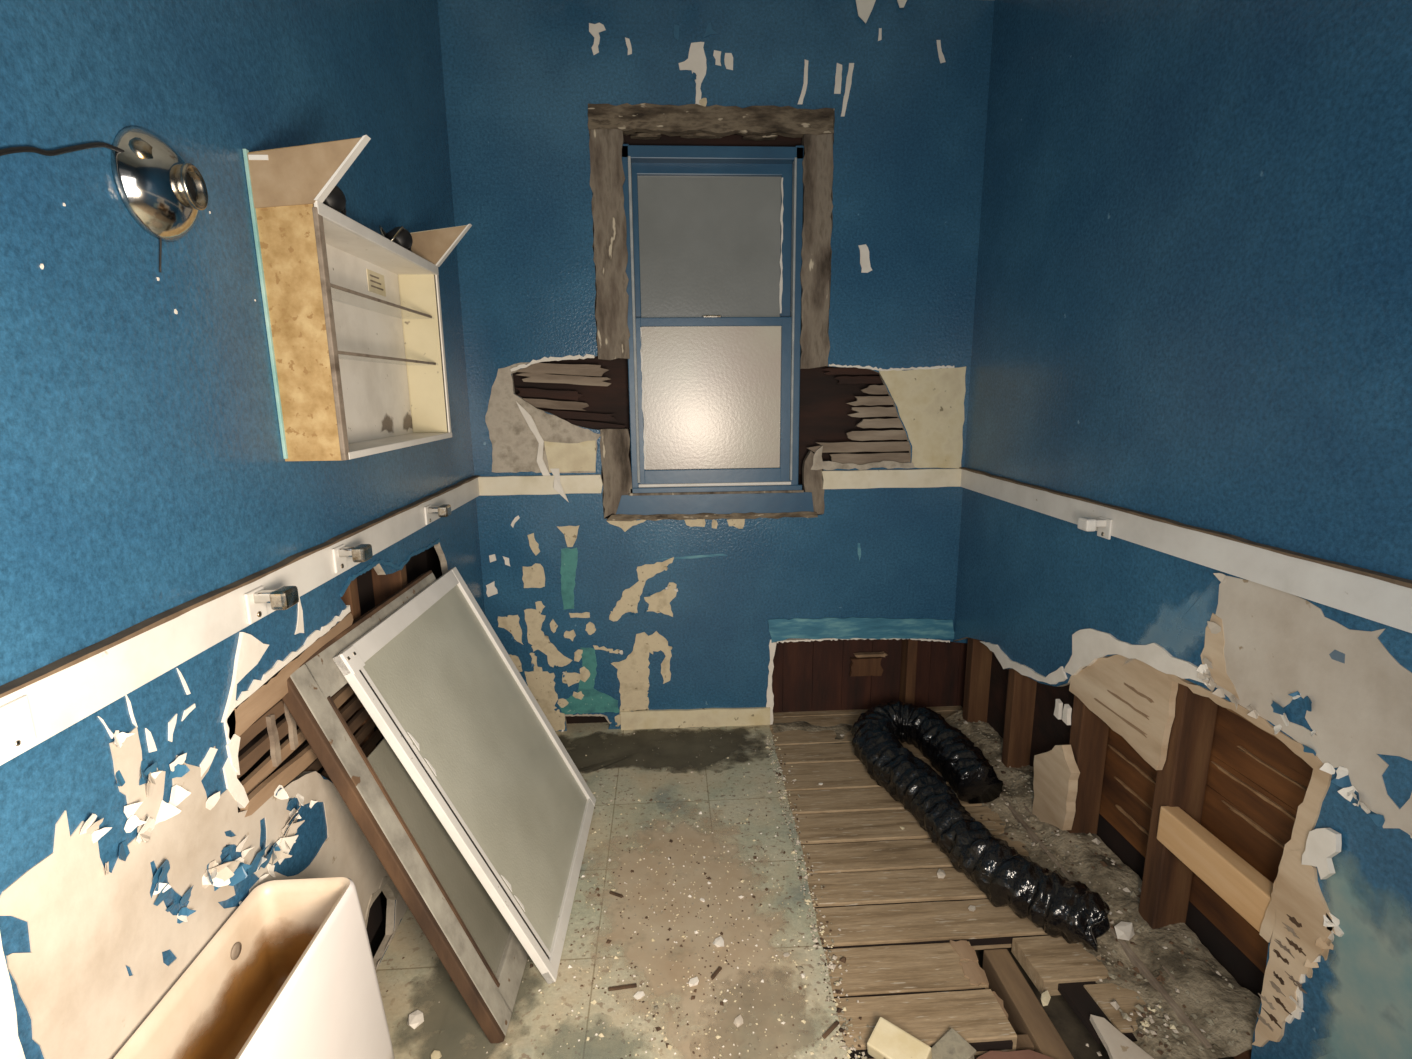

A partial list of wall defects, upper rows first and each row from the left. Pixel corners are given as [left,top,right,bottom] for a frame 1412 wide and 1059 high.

peeling [589,23,606,55]
peeling [679,42,733,107]
peeling [834,63,854,117]
peeling [858,244,872,273]
spalling [485,327,647,501]
spalling [798,364,966,474]
peeling [685,519,745,529]
peeling [486,581,498,597]
peeling [489,516,678,732]
peeling [0,539,440,1059]
spalling [766,573,1412,1059]